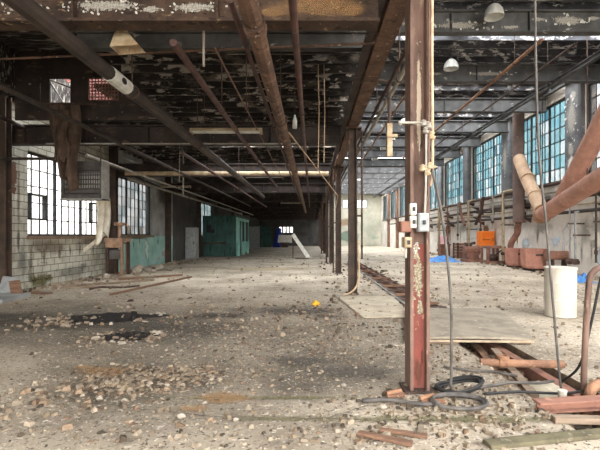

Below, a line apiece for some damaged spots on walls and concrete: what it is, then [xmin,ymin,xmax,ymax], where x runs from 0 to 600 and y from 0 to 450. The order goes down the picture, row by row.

peeling [62,0,214,15]
peeling [434,21,494,30]
peeling [532,13,599,26]
water stain [39,243,71,262]
peeling [414,242,424,314]